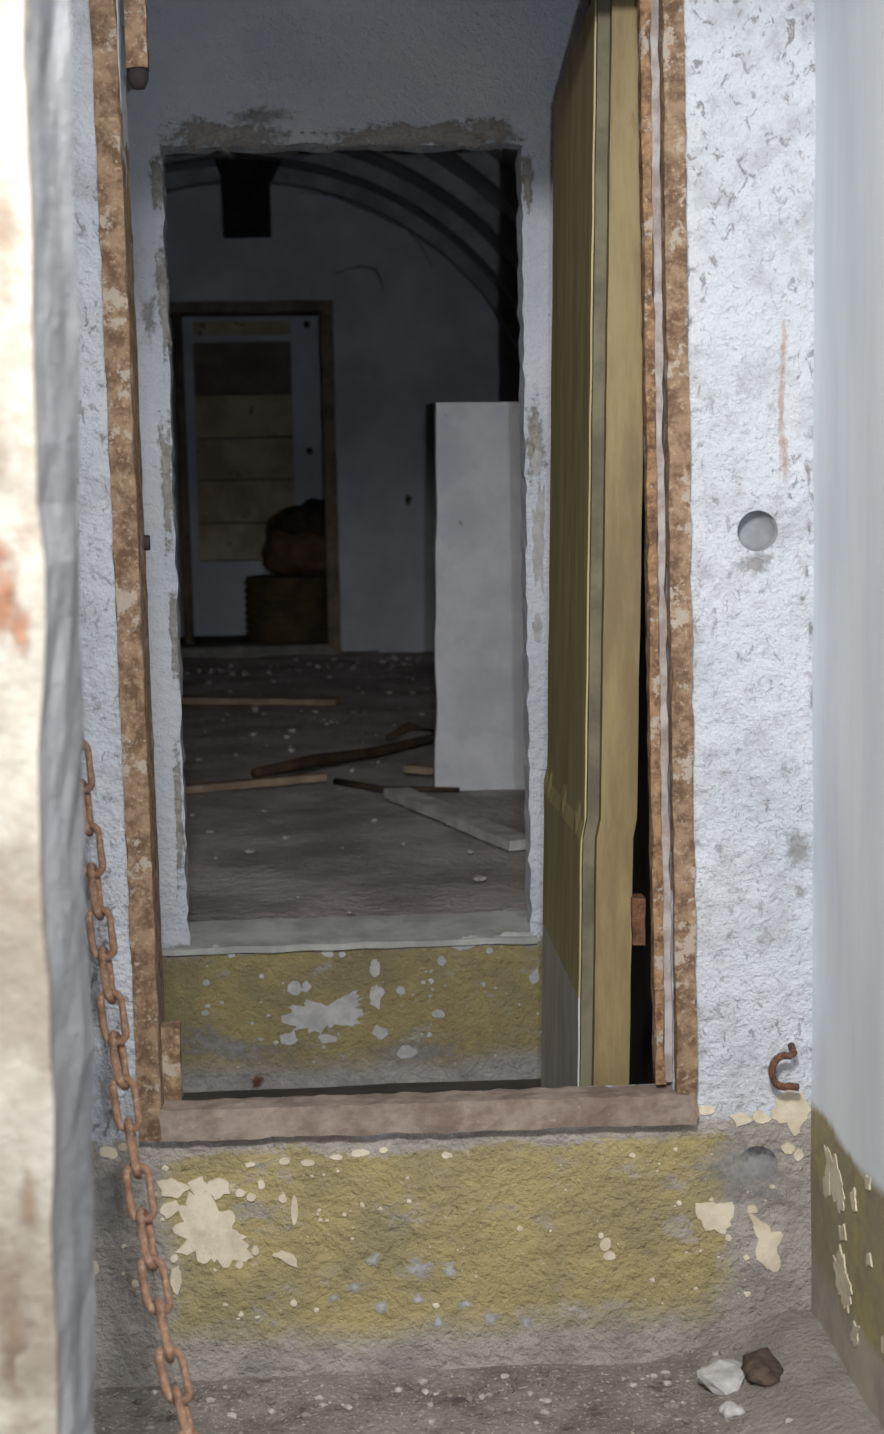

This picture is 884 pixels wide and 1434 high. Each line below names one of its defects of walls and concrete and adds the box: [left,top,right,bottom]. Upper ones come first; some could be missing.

peeling [280,959,405,1045]
peeling [397,1045,418,1058]
peeling [99,1143,127,1159]
peeling [279,1147,388,1166]
peeling [699,1090,811,1161]
peeling [157,1162,298,1295]
peeling [695,1201,783,1272]
peeling [823,1145,872,1347]